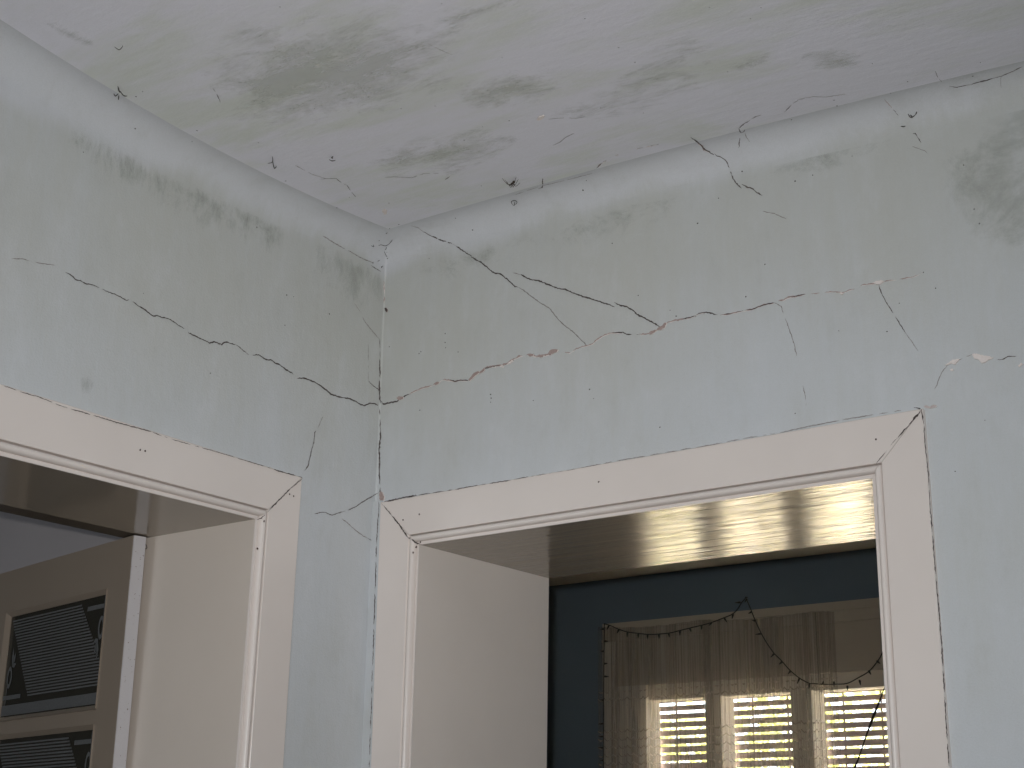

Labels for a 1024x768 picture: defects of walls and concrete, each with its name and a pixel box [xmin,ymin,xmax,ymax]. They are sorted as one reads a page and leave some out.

crack [690,115,786,219]
crack [935,353,1023,388]
crack [8,226,949,765]